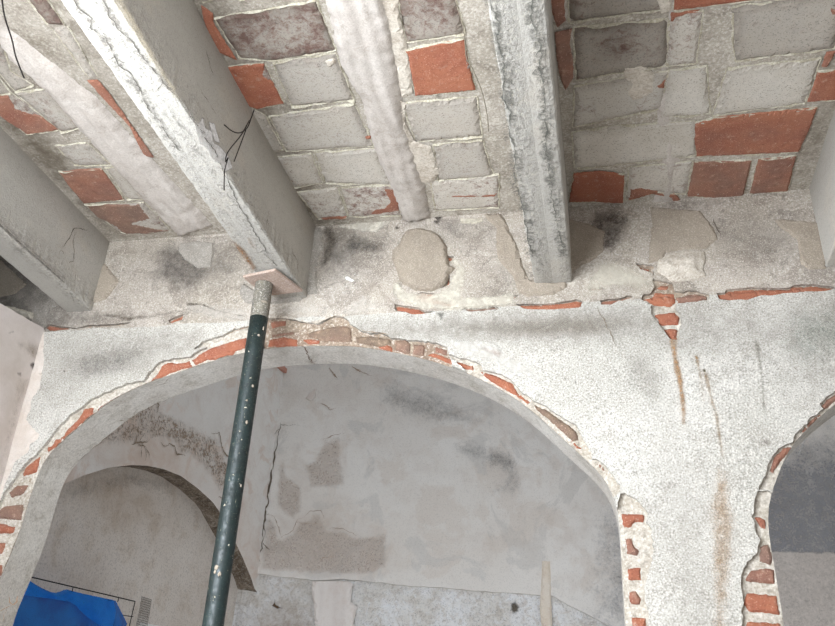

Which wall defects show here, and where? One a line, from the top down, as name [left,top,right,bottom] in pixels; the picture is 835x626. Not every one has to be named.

crack [74,0,277,266]
flaking render [0,326,248,576]
crack [259,425,291,561]
flaking render [264,317,654,626]
flaking render [510,297,582,310]
rust [671,341,684,422]
flaking render [643,286,831,340]
flaking render [741,393,835,626]